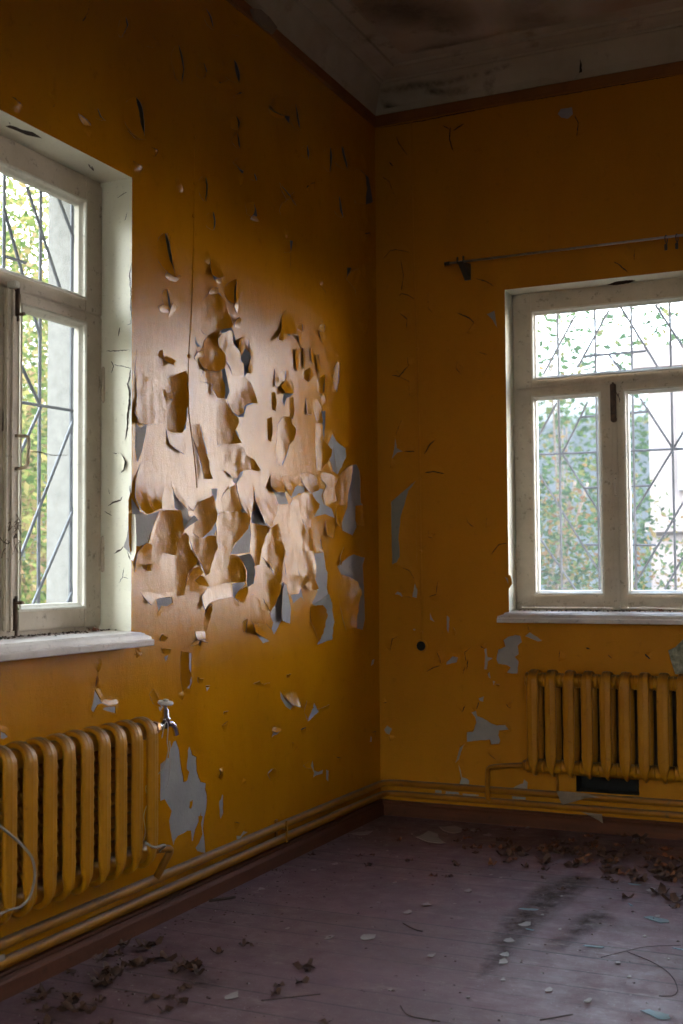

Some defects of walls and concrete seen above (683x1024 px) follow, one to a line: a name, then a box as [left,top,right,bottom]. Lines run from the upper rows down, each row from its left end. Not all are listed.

peeling [156,233,182,317]
peeling [114,251,366,700]
flaking render [480,625,546,678]
flaking render [88,676,118,718]
peeling [254,674,330,725]
flaking render [463,693,512,748]
flaking render [158,736,225,856]